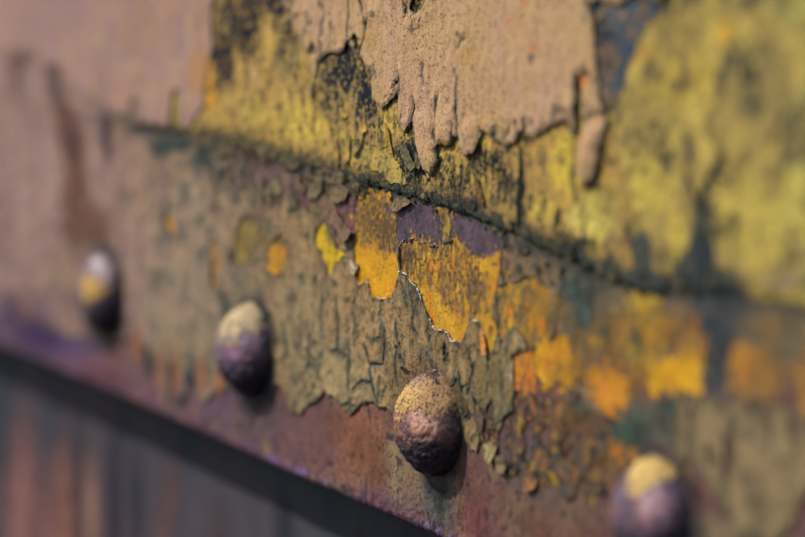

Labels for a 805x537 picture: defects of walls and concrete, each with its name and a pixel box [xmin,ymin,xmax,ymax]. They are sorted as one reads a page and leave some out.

peeling [151,0,805,501]
crack [515,132,523,228]
crack [553,207,561,229]
crack [332,345,398,406]
rust [8,427,55,537]
rust [84,463,97,537]